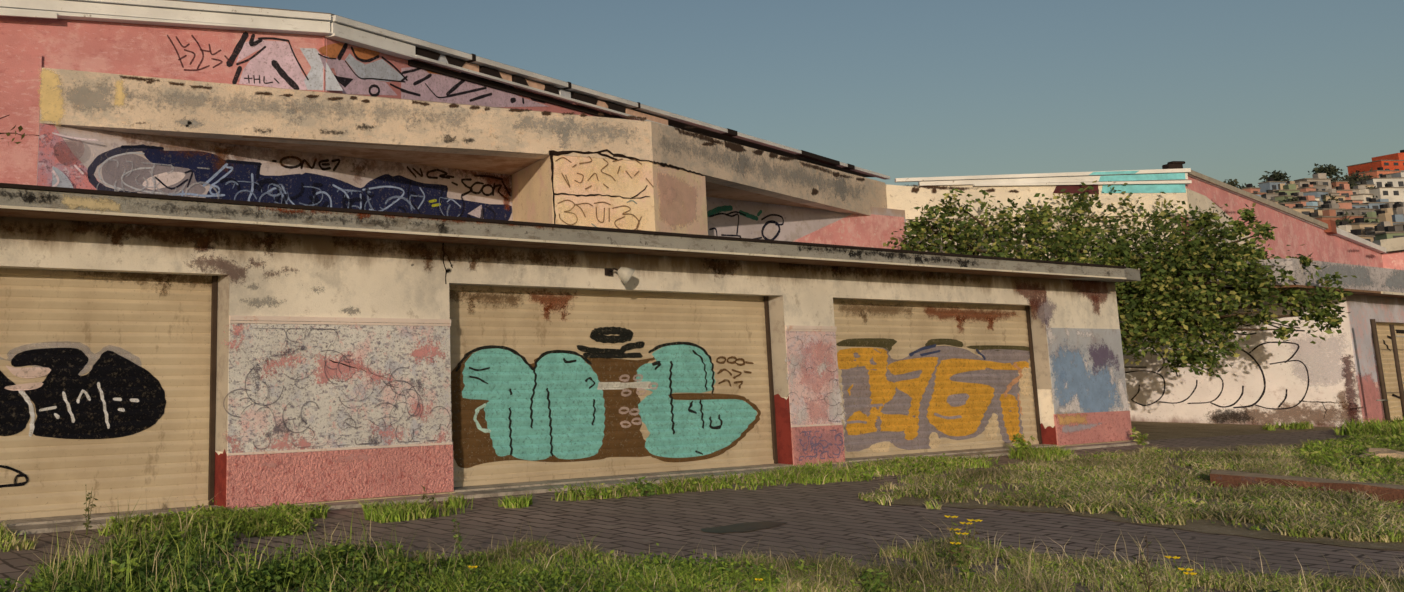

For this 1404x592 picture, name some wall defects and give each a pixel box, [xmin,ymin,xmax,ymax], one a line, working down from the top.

water stain [1,191,58,203]
water stain [0,221,286,255]
water stain [141,203,576,271]
rust [449,287,577,321]
rust [924,280,1047,331]
peeling [251,339,451,446]
peeling [1046,325,1130,433]
peeling [225,417,318,456]